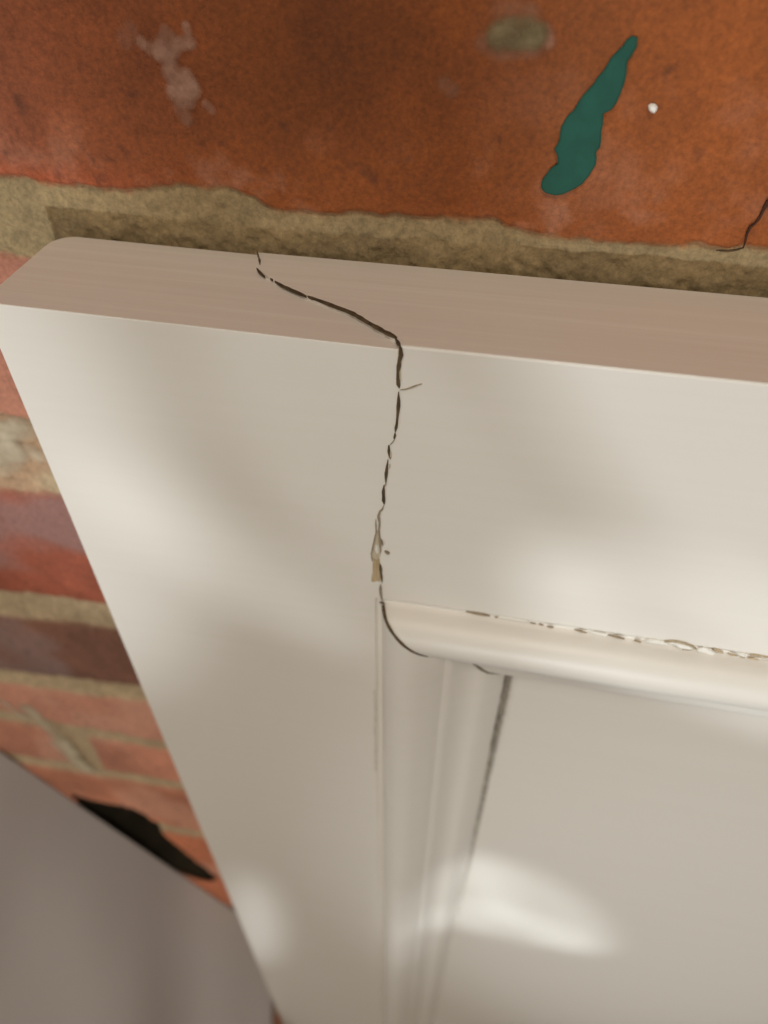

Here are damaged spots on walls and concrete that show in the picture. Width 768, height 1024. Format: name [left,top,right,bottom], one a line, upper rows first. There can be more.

damp [138,24,198,107]
crack [716,199,768,252]
crack [256,251,428,657]
peeling [466,611,554,628]
peeling [574,629,768,660]
spalling [73,795,217,881]